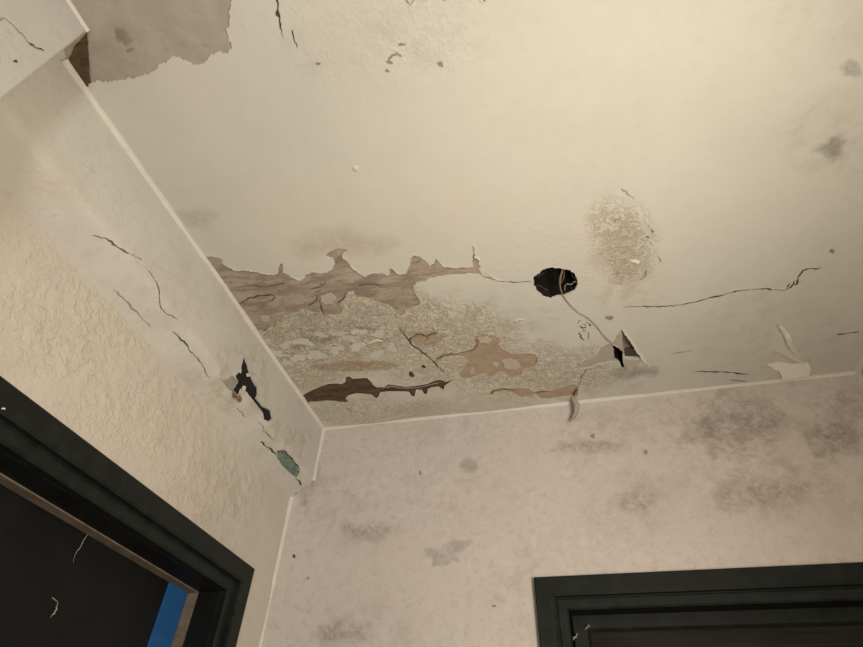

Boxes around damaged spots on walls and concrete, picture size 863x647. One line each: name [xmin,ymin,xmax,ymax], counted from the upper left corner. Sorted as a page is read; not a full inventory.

crack [0,18,44,51]
peeling [64,0,232,83]
crack [92,235,208,376]
flaking render [207,243,485,365]
crack [630,249,835,308]
peeling [303,318,541,412]
peeling [490,343,615,421]
peeling [261,441,302,495]